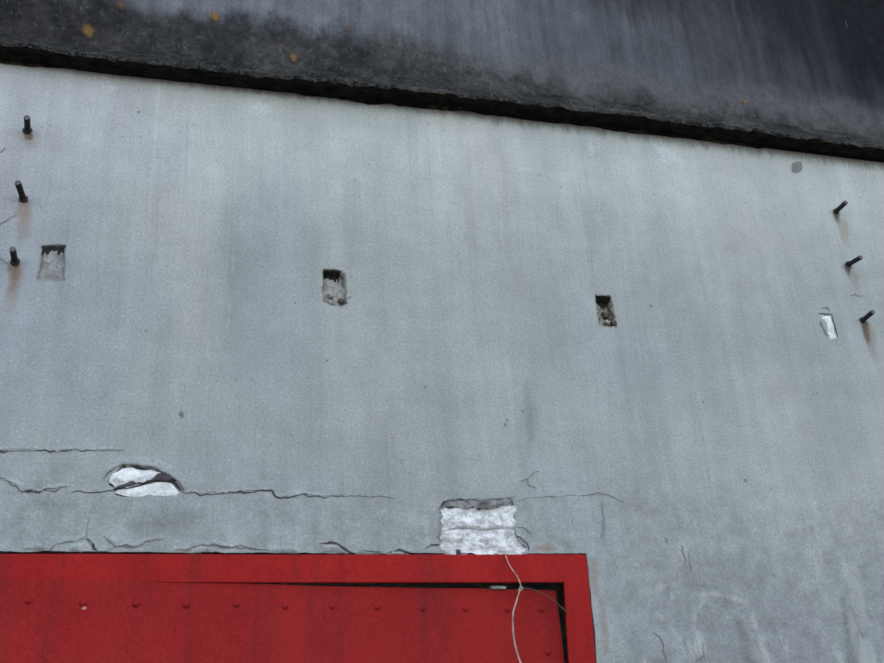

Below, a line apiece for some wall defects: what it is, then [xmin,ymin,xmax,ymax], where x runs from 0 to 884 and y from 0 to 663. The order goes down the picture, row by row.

water stain [99,80,124,97]
water stain [242,99,274,120]
water stain [650,142,681,169]
crack [0,445,124,493]
crack [182,486,395,499]